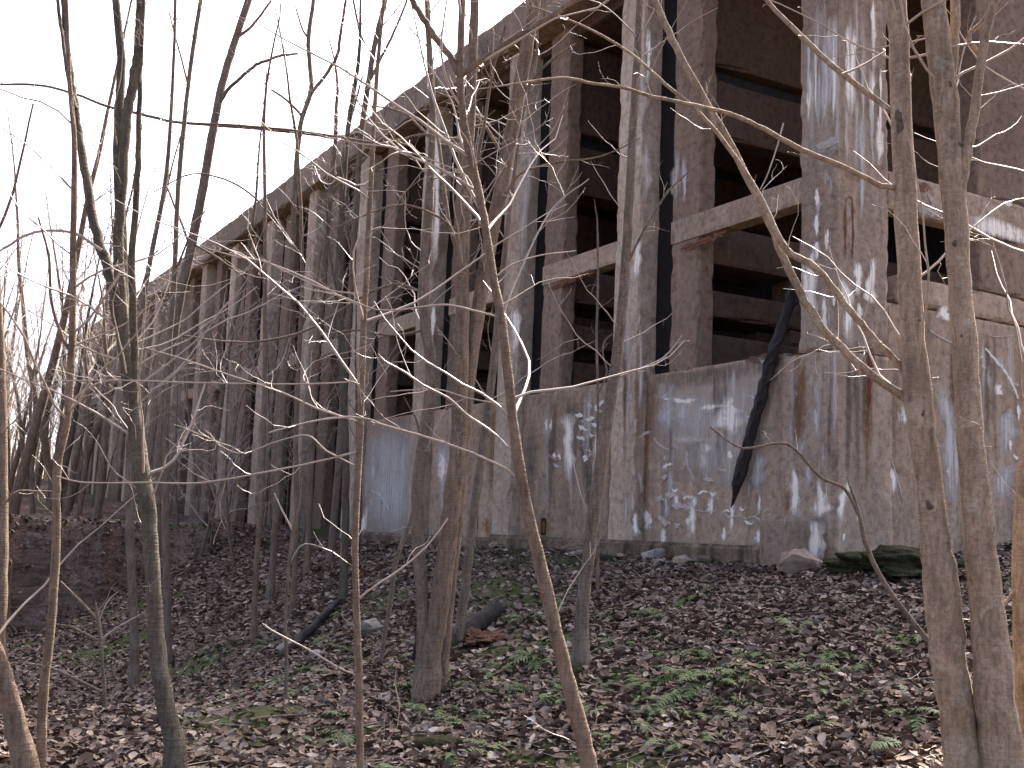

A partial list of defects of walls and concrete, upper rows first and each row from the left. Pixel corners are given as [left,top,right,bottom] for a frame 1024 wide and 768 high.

leakage [807,3,884,205]
rust [844,196,854,257]
peeling [575,400,604,441]
leakage [791,349,838,452]
leakage [785,451,850,557]
leakage [890,461,903,502]